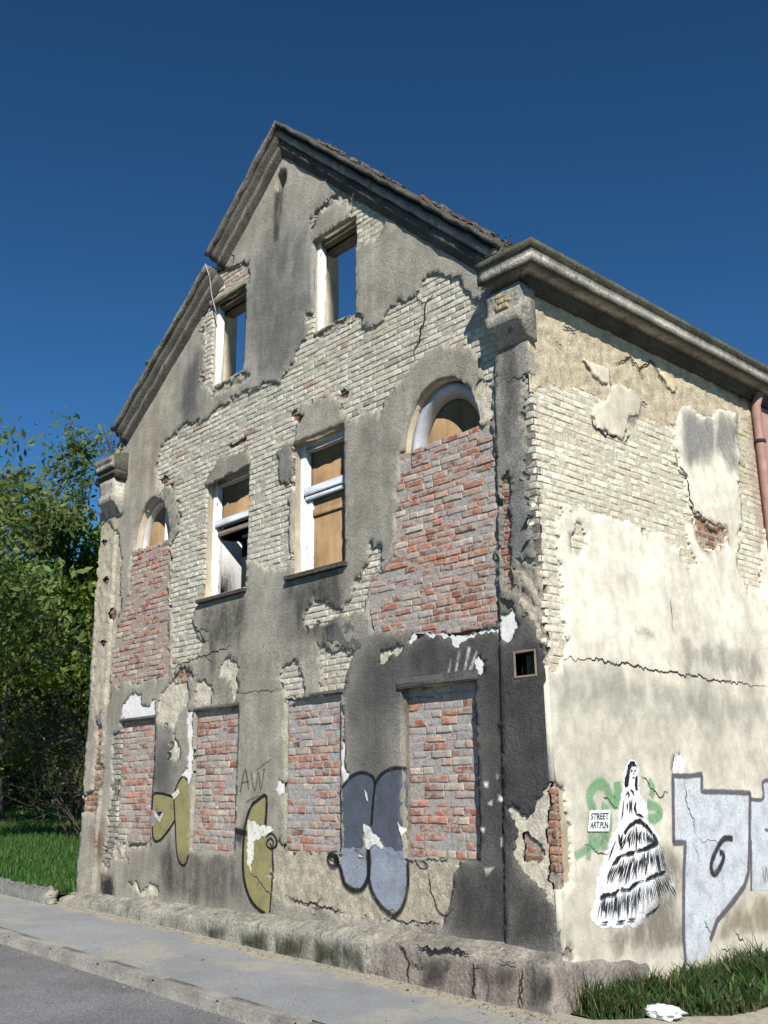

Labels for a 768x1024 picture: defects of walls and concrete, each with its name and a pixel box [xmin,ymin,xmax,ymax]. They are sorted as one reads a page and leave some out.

damp [274,187,283,240]
crack [413,290,435,360]
spalling [380,297,765,673]
crack [671,447,722,528]
spalling [84,274,510,868]
crack [556,656,766,687]
flaking render [508,782,564,909]
crack [380,873,523,1008]